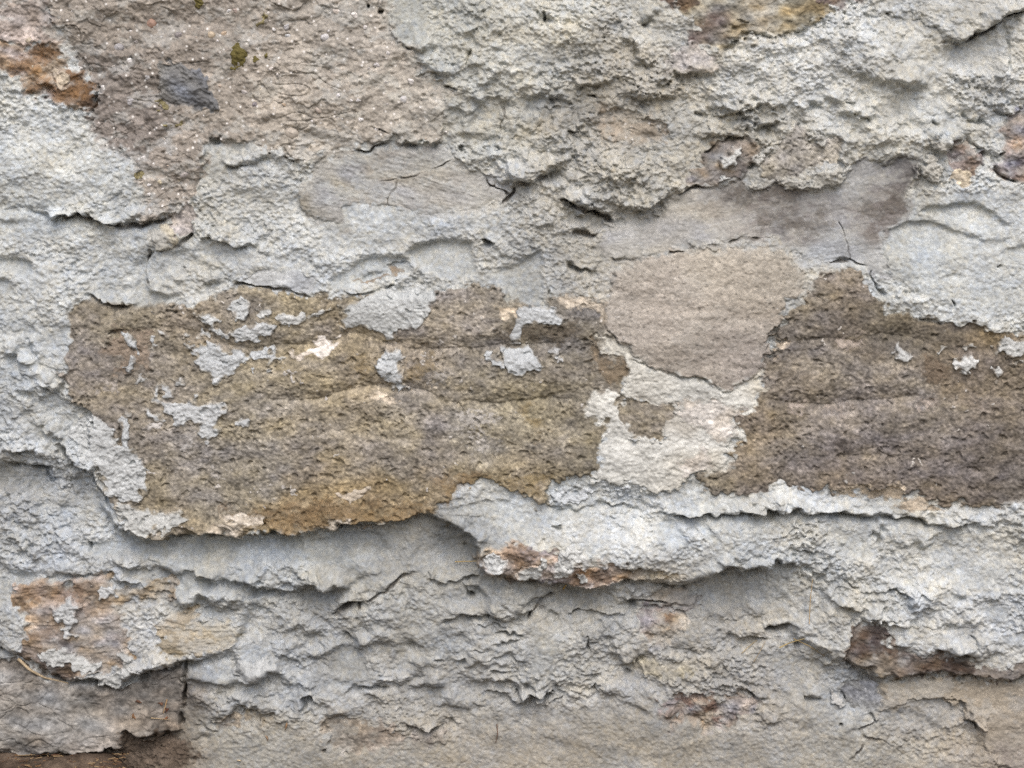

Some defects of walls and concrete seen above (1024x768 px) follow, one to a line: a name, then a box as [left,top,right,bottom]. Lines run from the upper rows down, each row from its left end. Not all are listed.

peeling [255,303,273,319]
spalling [101,327,211,376]
peeling [481,350,505,370]
spalling [590,337,629,384]
peeling [990,360,1024,385]
peeling [162,377,186,399]
peeling [234,417,250,428]
peeling [335,486,371,504]
peeling [90,585,119,601]
peeling [78,649,143,690]